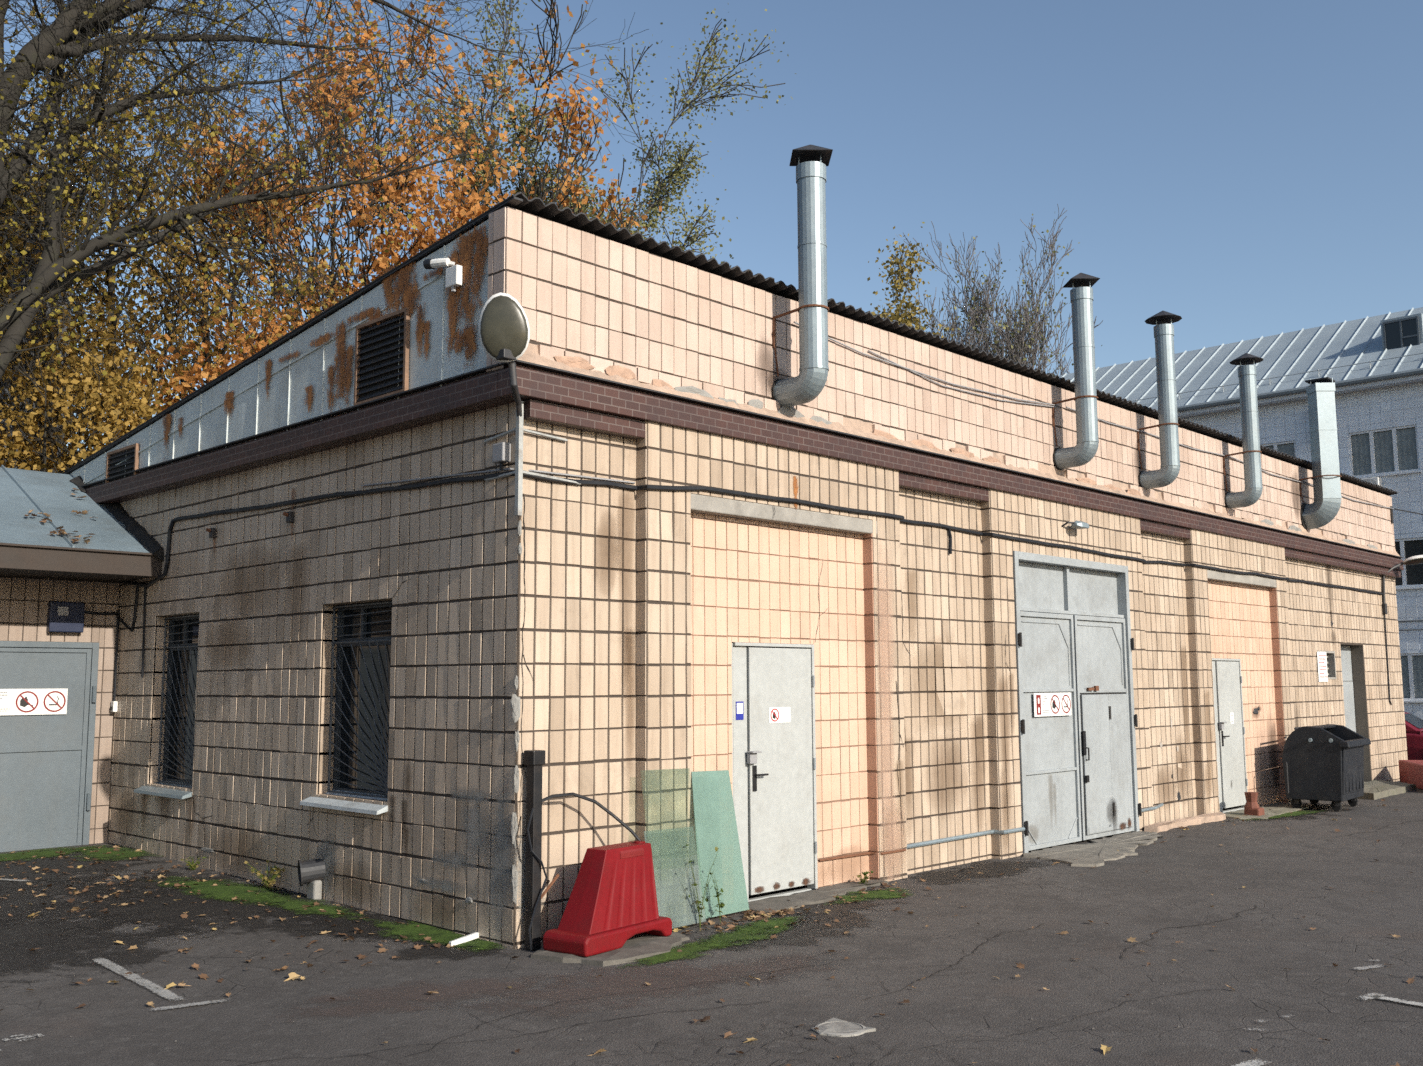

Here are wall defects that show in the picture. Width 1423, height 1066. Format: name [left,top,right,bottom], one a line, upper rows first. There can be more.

rust [265,222,489,414]
rust [223,390,235,416]
rust [161,413,183,459]